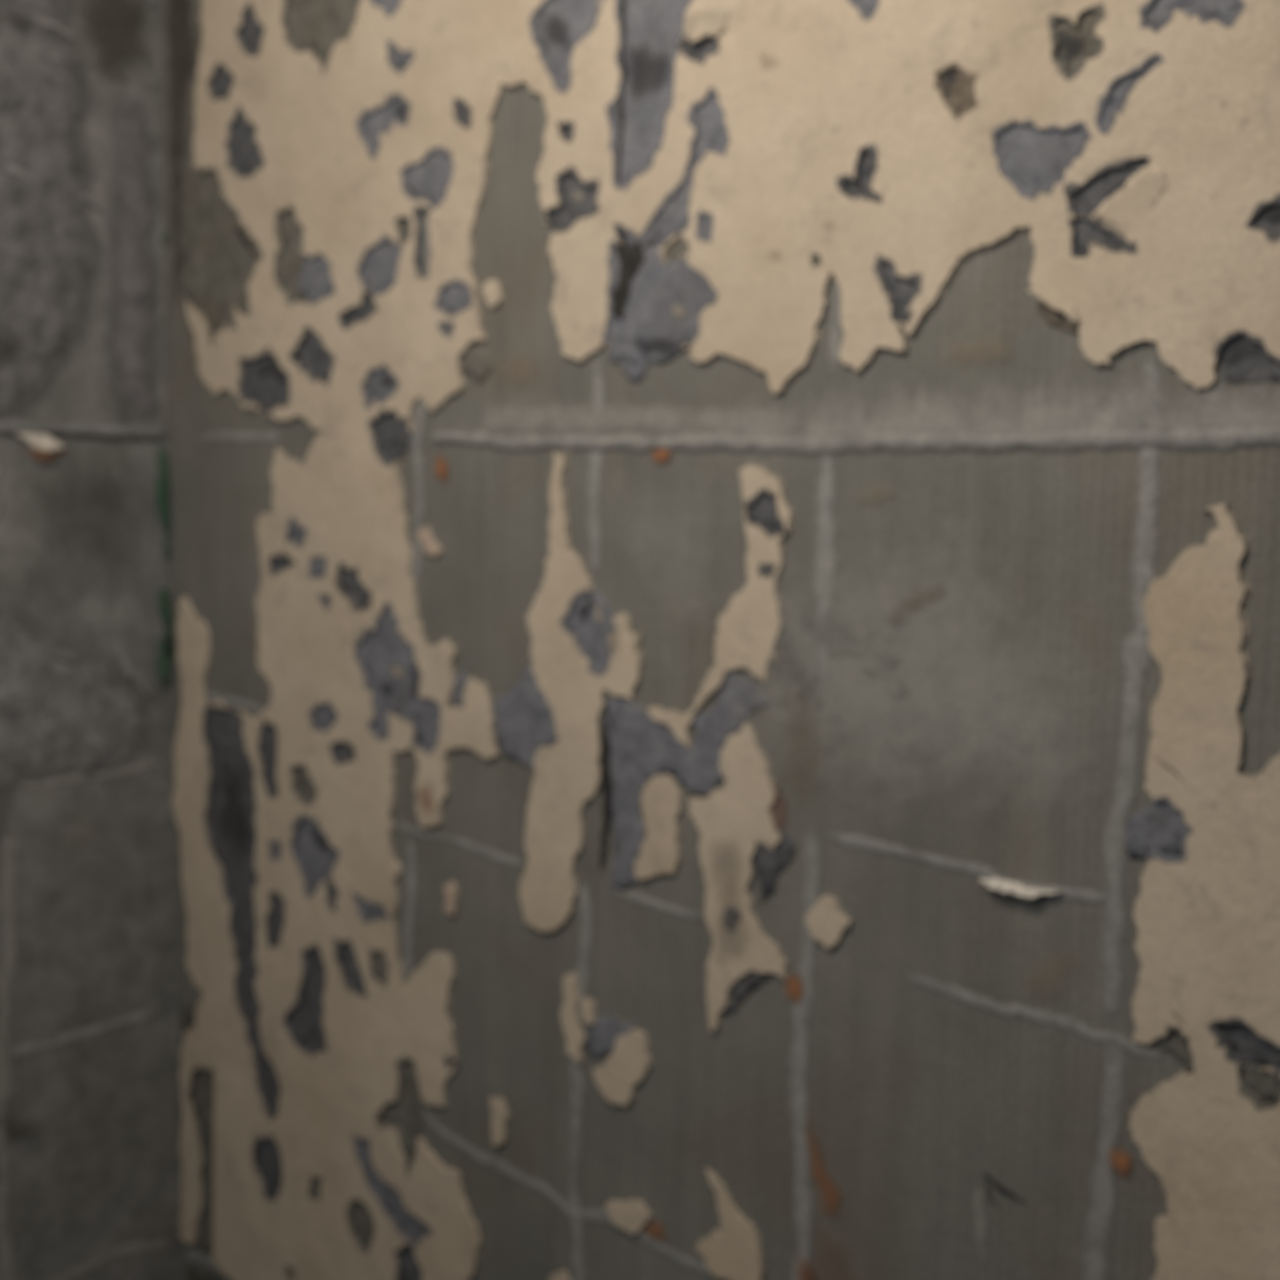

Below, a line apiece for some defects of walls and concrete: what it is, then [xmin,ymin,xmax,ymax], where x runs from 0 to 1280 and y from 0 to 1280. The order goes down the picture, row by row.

peeling [658,233,681,255]
spalling [559,588,616,675]
spalling [492,662,559,771]
crack [598,695,614,871]
spalling [602,464,797,1033]
peeling [979,878,1061,899]
peeling [1126,502,1280,1280]
spalling [585,1014,639,1060]